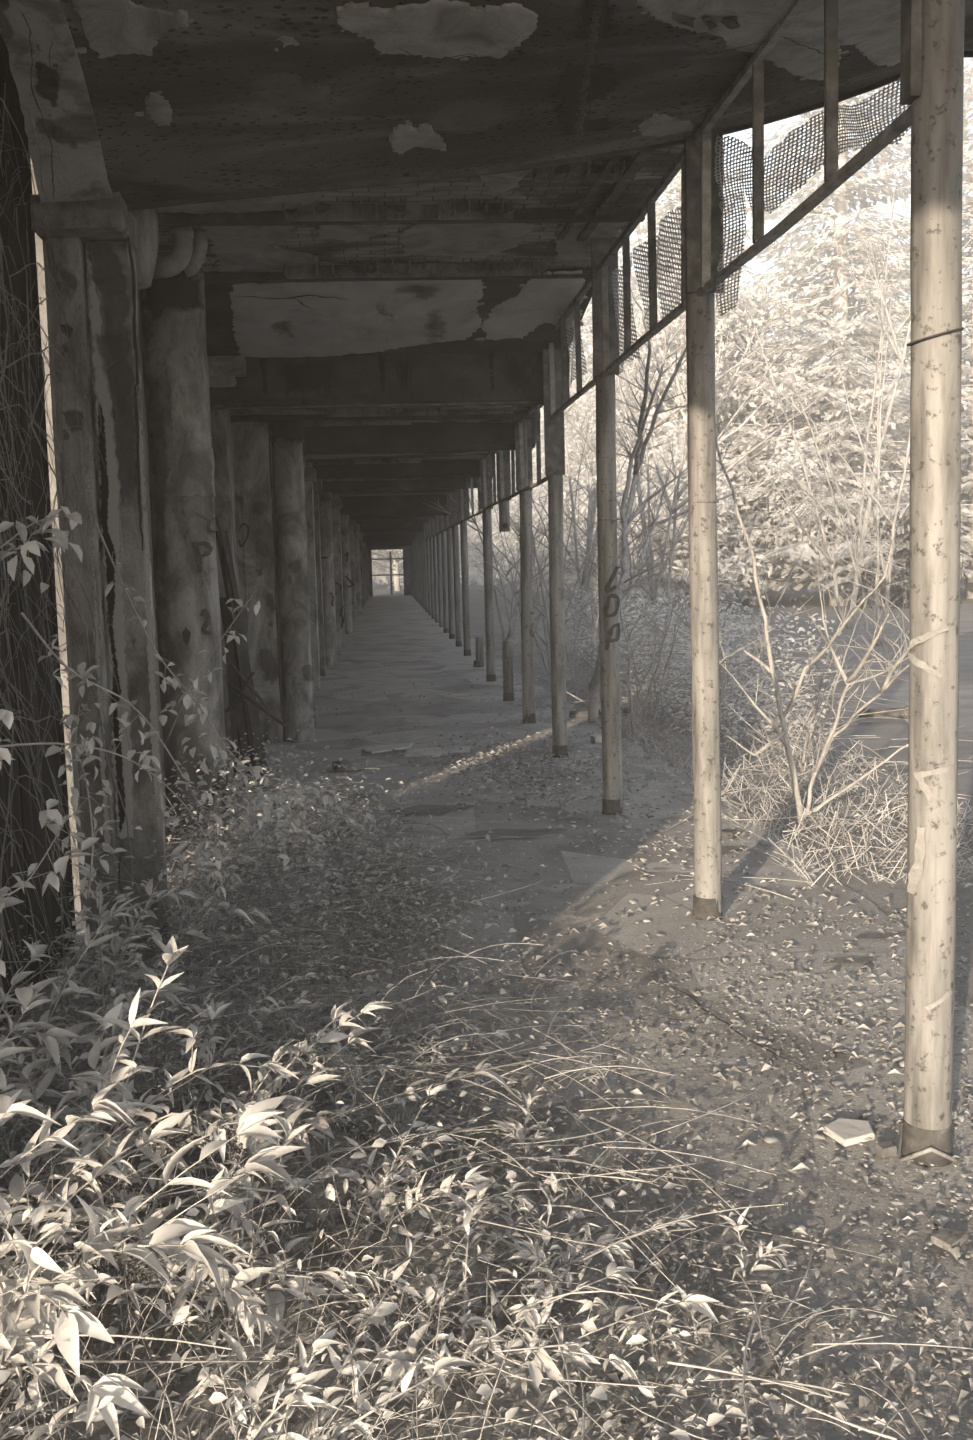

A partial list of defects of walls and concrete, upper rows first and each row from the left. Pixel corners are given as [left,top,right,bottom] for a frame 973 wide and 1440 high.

flaking render [71,0,194,58]
flaking render [336,0,538,67]
flaking render [637,0,901,81]
flaking render [36,45,60,116]
flaking render [135,90,172,126]
flaking render [389,120,446,154]
flaking render [155,191,627,358]